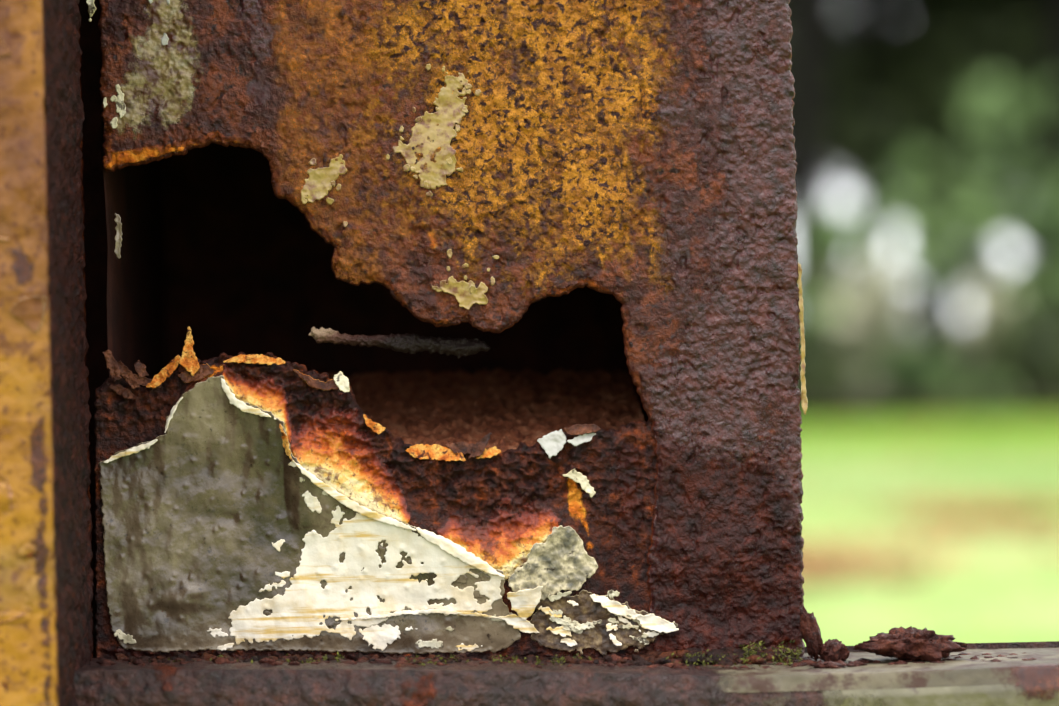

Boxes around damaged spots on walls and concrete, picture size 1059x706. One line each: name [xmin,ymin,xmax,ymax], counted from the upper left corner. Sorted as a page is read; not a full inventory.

peeling [86,0,96,22]
peeling [114,213,122,259]
peeling [103,0,200,138]
peeling [301,154,347,204]
peeling [386,64,481,196]
peeling [432,249,499,310]
rust [94,0,867,706]
peeling [99,375,679,655]